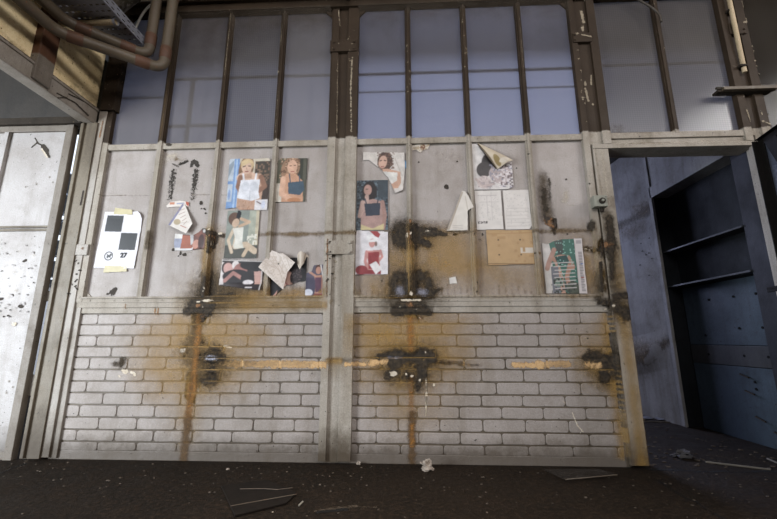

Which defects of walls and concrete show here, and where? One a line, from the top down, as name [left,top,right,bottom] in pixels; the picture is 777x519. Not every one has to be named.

rust [155,304,233,461]
rust [364,313,451,370]
rust [399,377,416,464]